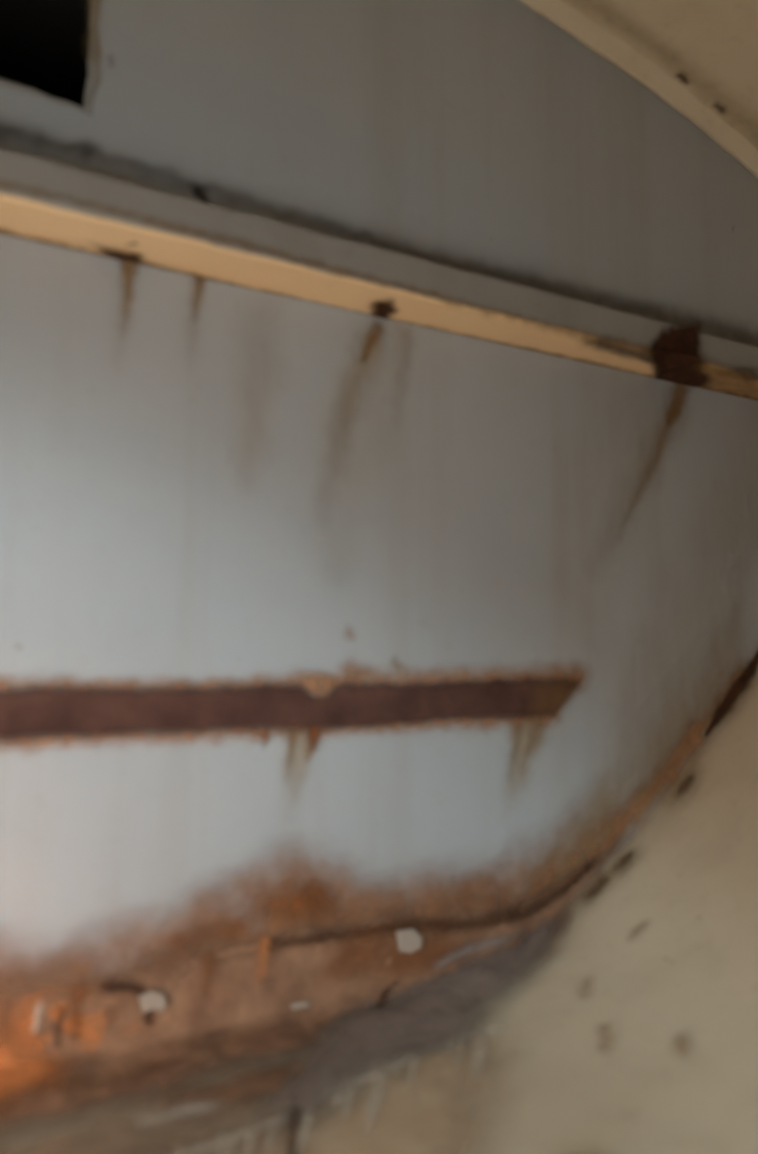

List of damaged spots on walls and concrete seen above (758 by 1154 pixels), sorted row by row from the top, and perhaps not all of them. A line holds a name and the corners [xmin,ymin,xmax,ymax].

rust [0,230,242,291]
rust [363,302,397,361]
rust [611,324,758,423]
rust [0,669,583,750]
peeling [396,928,423,953]
peeling [139,991,167,1013]